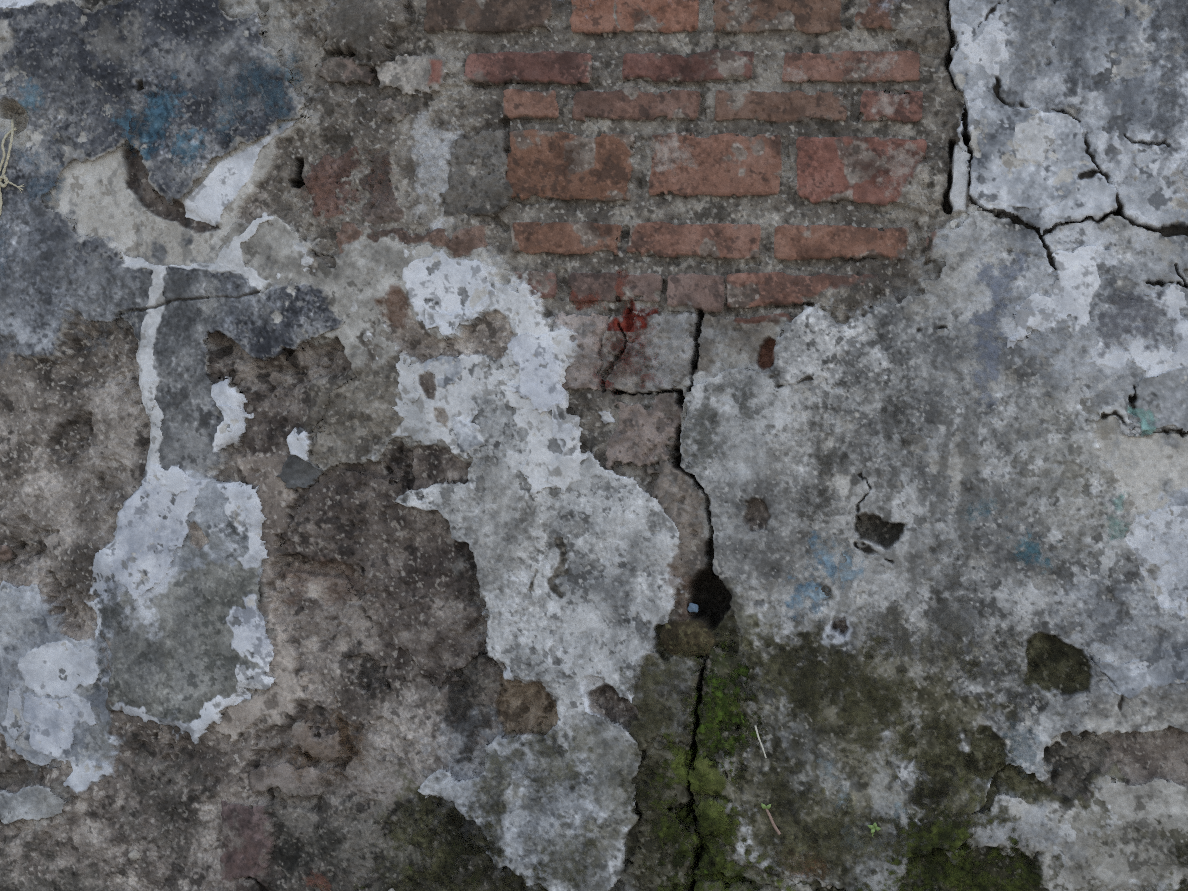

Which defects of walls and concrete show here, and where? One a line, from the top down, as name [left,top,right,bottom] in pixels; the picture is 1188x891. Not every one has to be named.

crack [945,0,1188,292]
crack [115,290,264,318]
spalling [0,0,971,643]
crack [604,311,714,565]
crack [777,376,816,389]
crack [1102,388,1188,437]
spalling [0,252,559,891]
spalling [652,577,697,661]
spalling [580,676,639,732]
crack [1081,644,1126,711]
spalling [610,802,642,891]
spalling [896,726,1188,891]